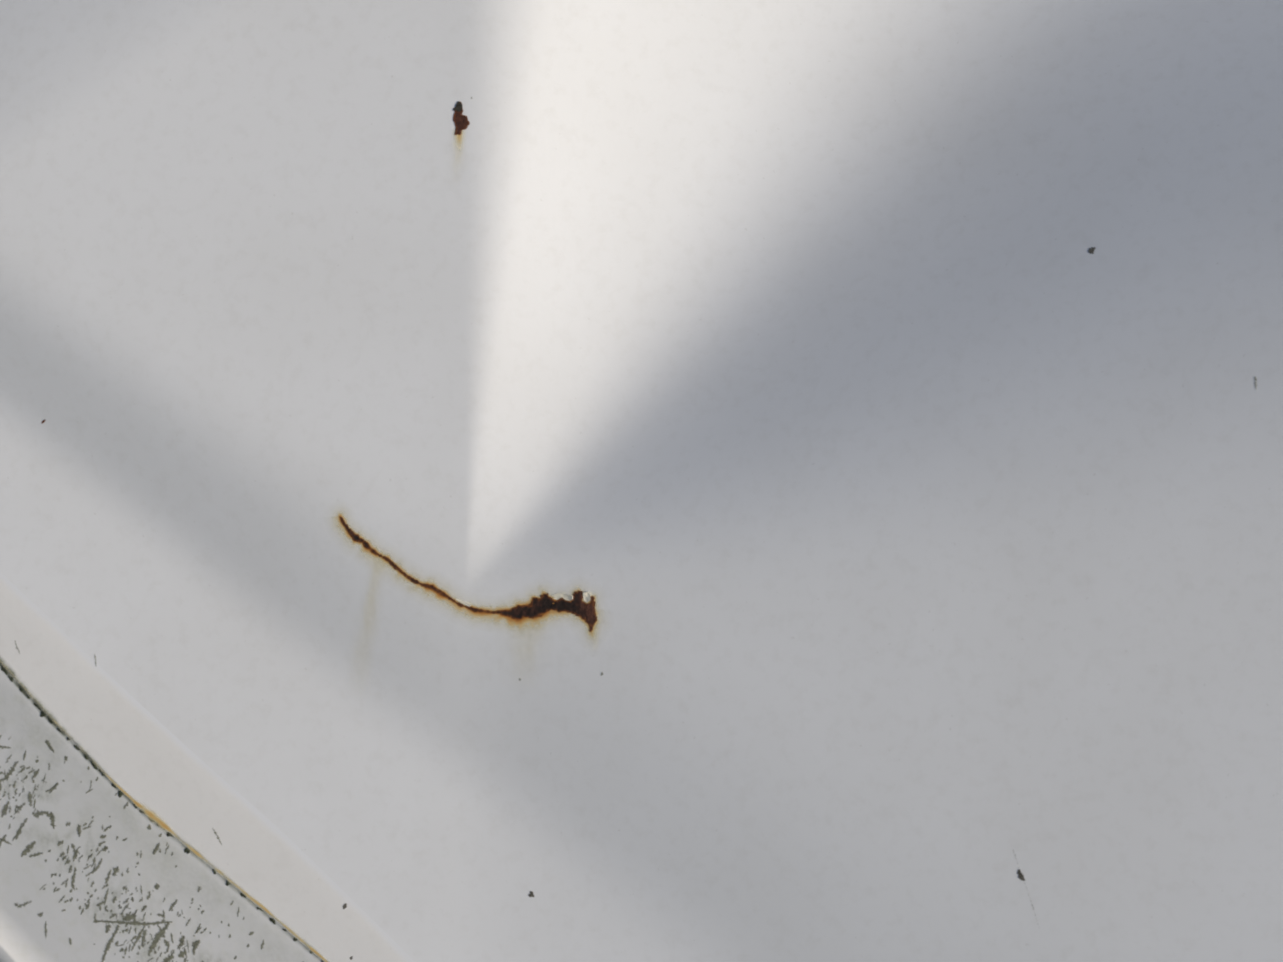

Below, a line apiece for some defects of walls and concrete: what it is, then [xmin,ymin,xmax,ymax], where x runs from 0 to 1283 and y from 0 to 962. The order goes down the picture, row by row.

corrosion [453,101,470,144]